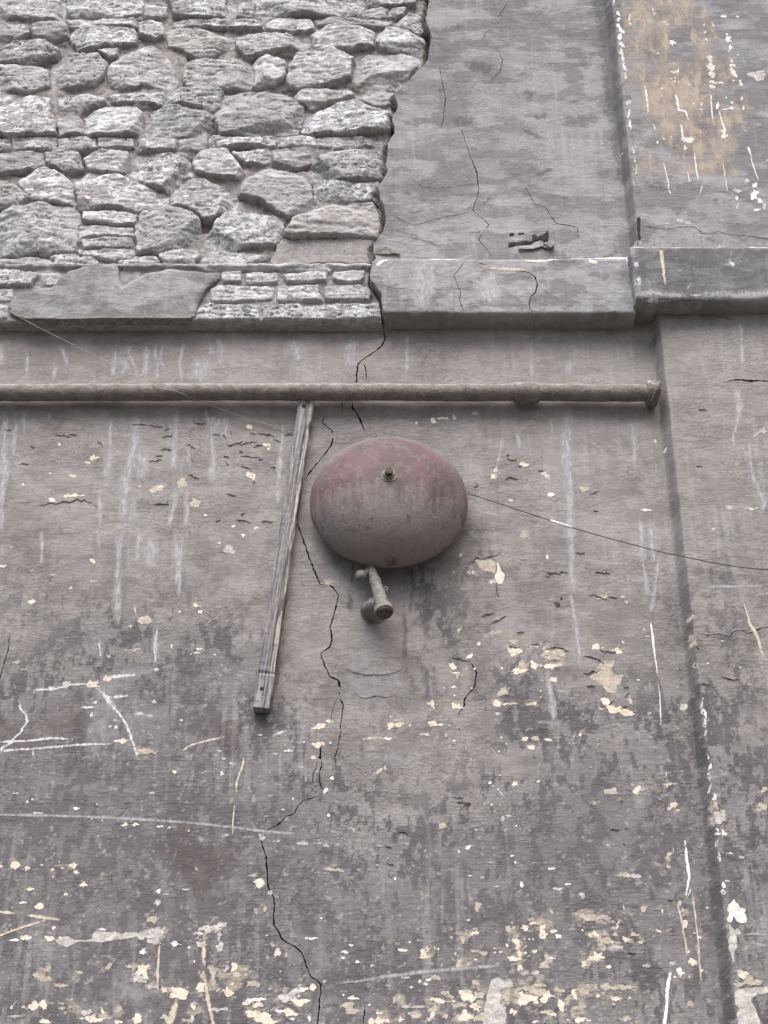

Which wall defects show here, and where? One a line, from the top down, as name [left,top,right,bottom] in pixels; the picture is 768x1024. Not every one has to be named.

crack [476,3,509,84]
crack [376,66,541,312]
crack [522,185,768,242]
crack [304,330,389,480]
peeling [452,557,505,584]
crack [455,659,480,717]
peeling [489,630,566,715]
peeling [589,641,652,716]
crack [256,518,393,1024]
peeling [5,889,326,1024]
peeling [340,902,644,1024]
peeling [721,880,768,1024]